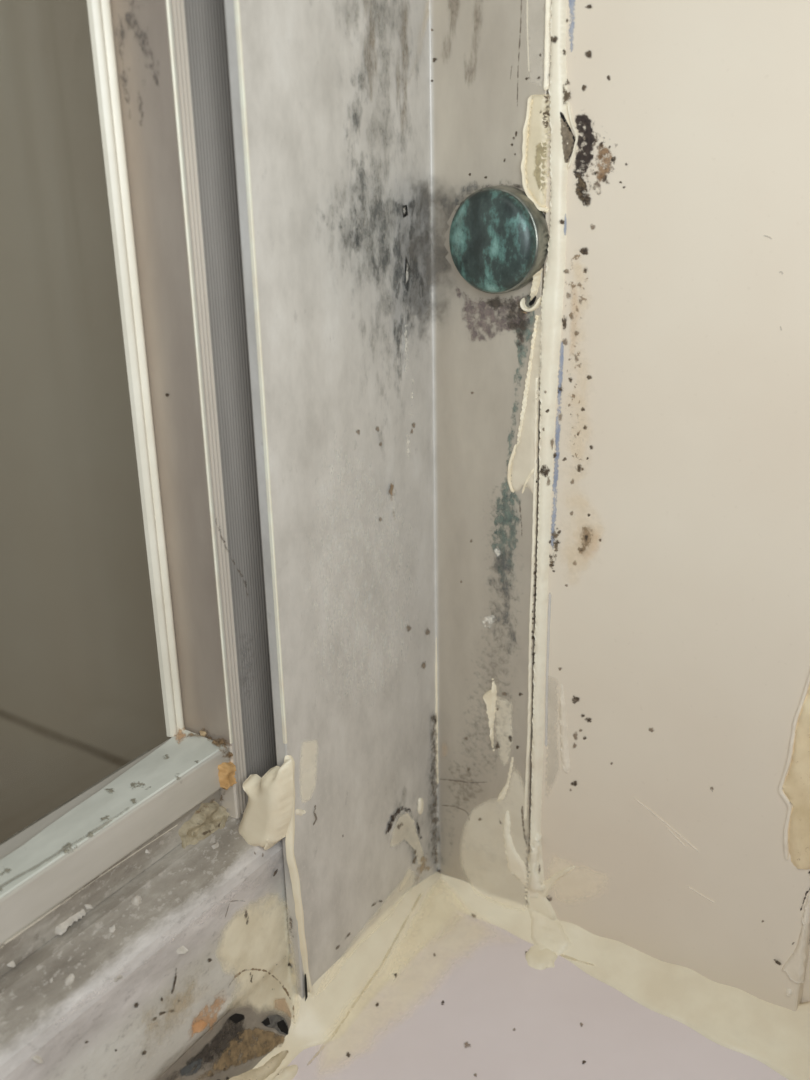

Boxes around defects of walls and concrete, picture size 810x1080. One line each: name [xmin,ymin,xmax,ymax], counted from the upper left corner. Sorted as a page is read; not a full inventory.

damp [534,143,546,189]
damp [573,114,627,206]
damp [341,164,488,350]
damp [457,289,534,381]
damp [538,248,593,572]
damp [490,480,519,621]
damp [573,514,601,565]
damp [531,571,561,746]